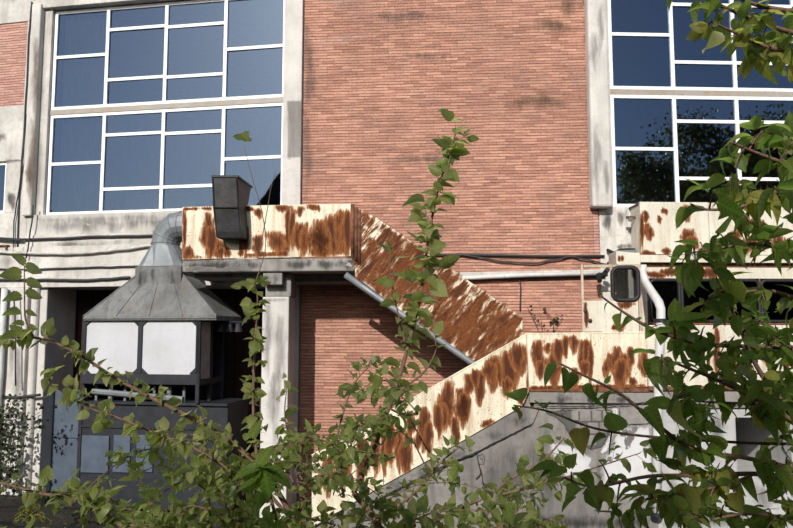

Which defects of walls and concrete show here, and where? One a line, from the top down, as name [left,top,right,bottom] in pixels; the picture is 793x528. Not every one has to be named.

corrosion [639,207,671,255]
corrosion [680,205,699,249]
corrosion [182,204,647,498]